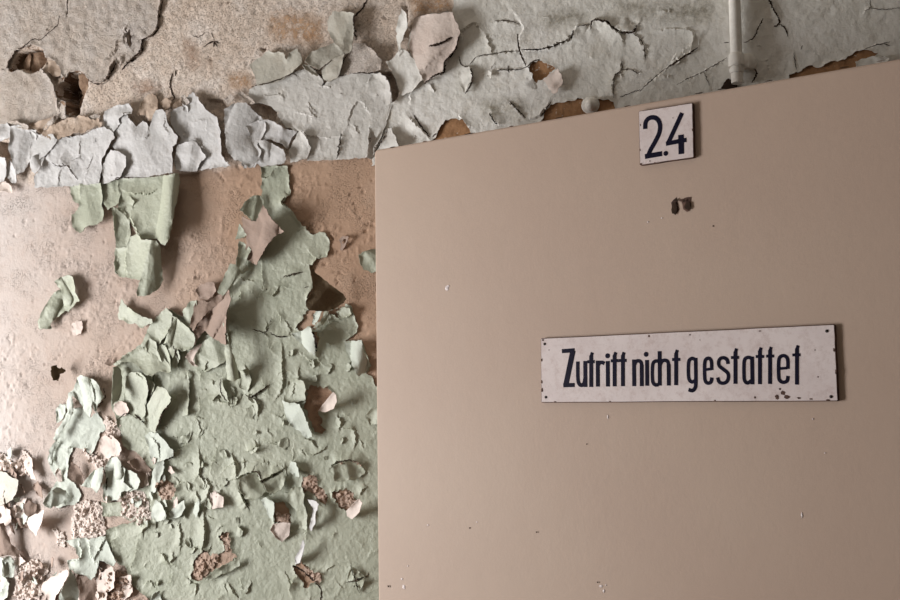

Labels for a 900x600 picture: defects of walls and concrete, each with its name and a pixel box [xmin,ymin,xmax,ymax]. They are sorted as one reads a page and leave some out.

spalling [9,46,48,73]
crack [0,0,163,124]
peeling [224,0,731,168]
crack [424,0,802,98]
peeling [737,0,900,87]
peeling [0,70,230,296]
spalling [671,197,691,215]
peeling [0,165,379,600]